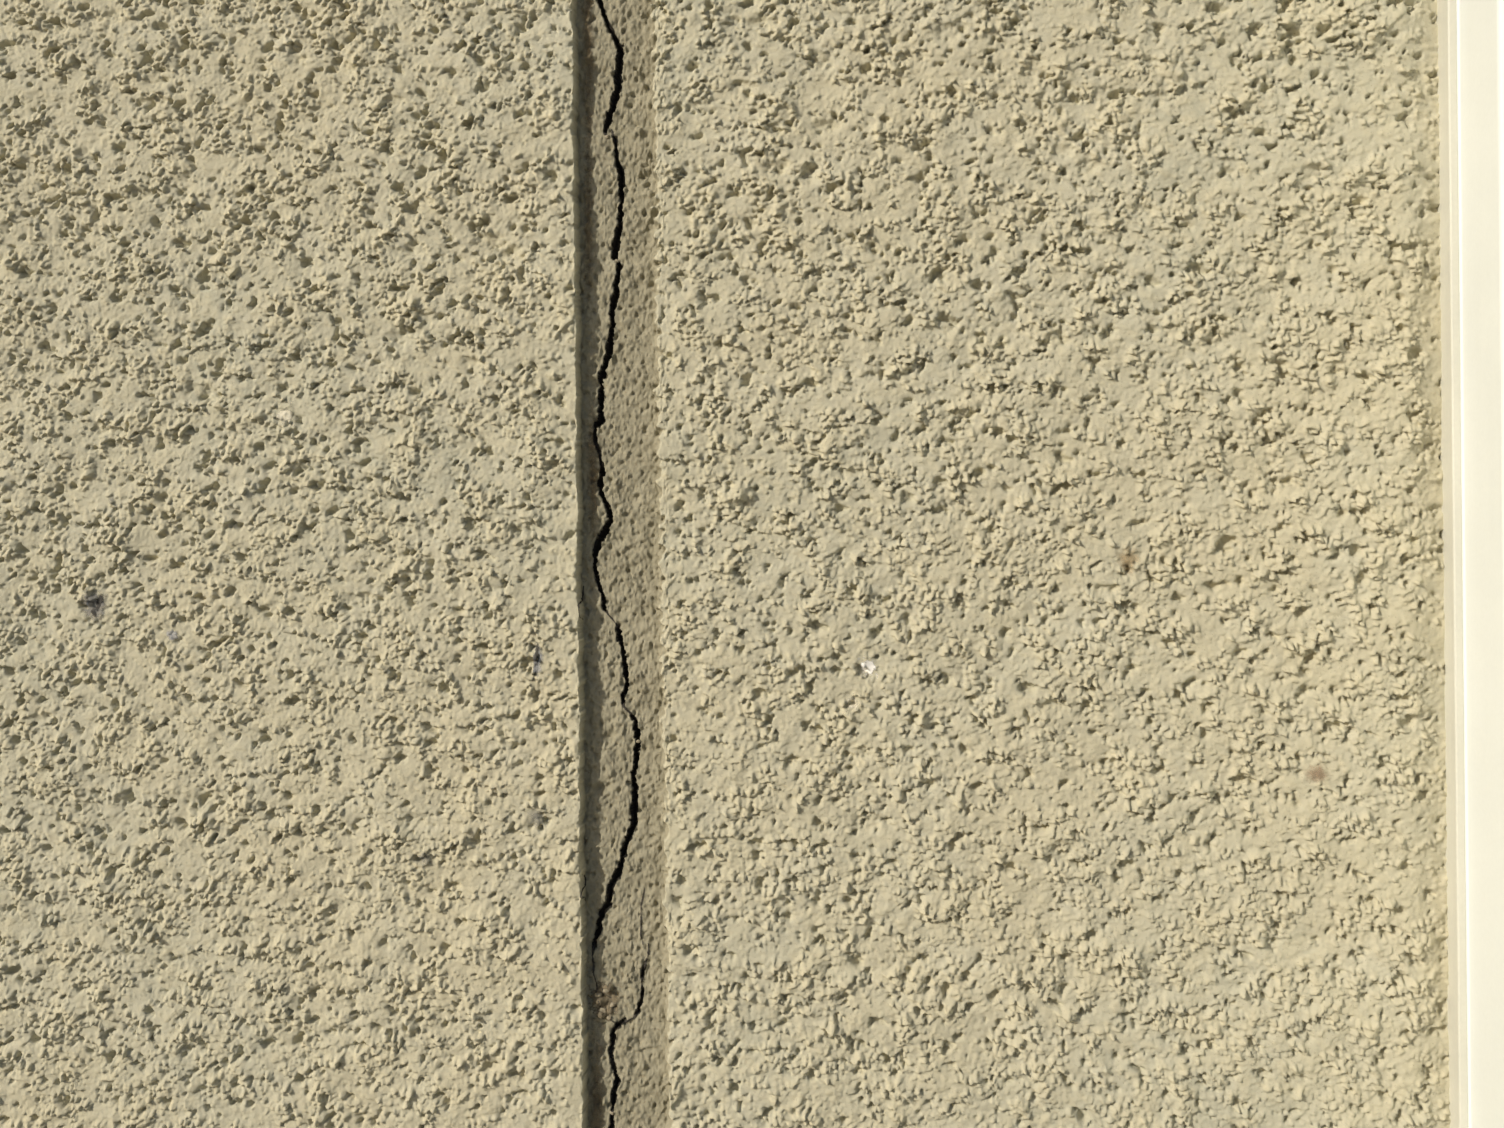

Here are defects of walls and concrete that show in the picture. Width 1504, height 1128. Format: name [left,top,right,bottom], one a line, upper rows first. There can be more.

crack [577,0,649,1128]